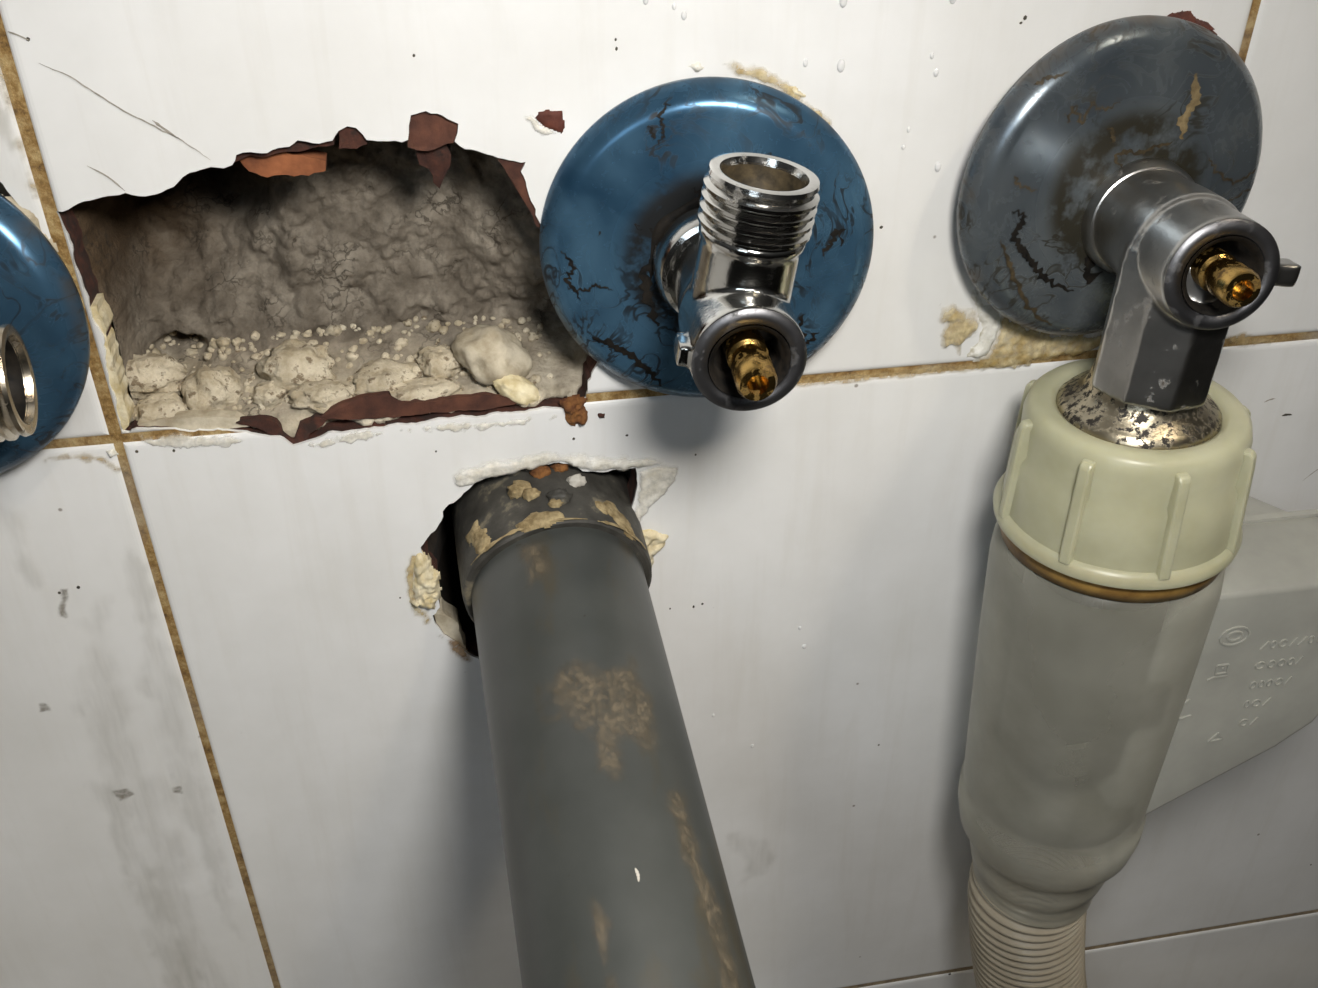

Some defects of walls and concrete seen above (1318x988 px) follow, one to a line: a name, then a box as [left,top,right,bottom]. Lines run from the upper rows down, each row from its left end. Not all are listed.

crack [8,31,210,160]
crack [88,166,125,191]
spalling [72,109,588,448]
spalling [456,454,677,565]
spalling [407,504,476,660]